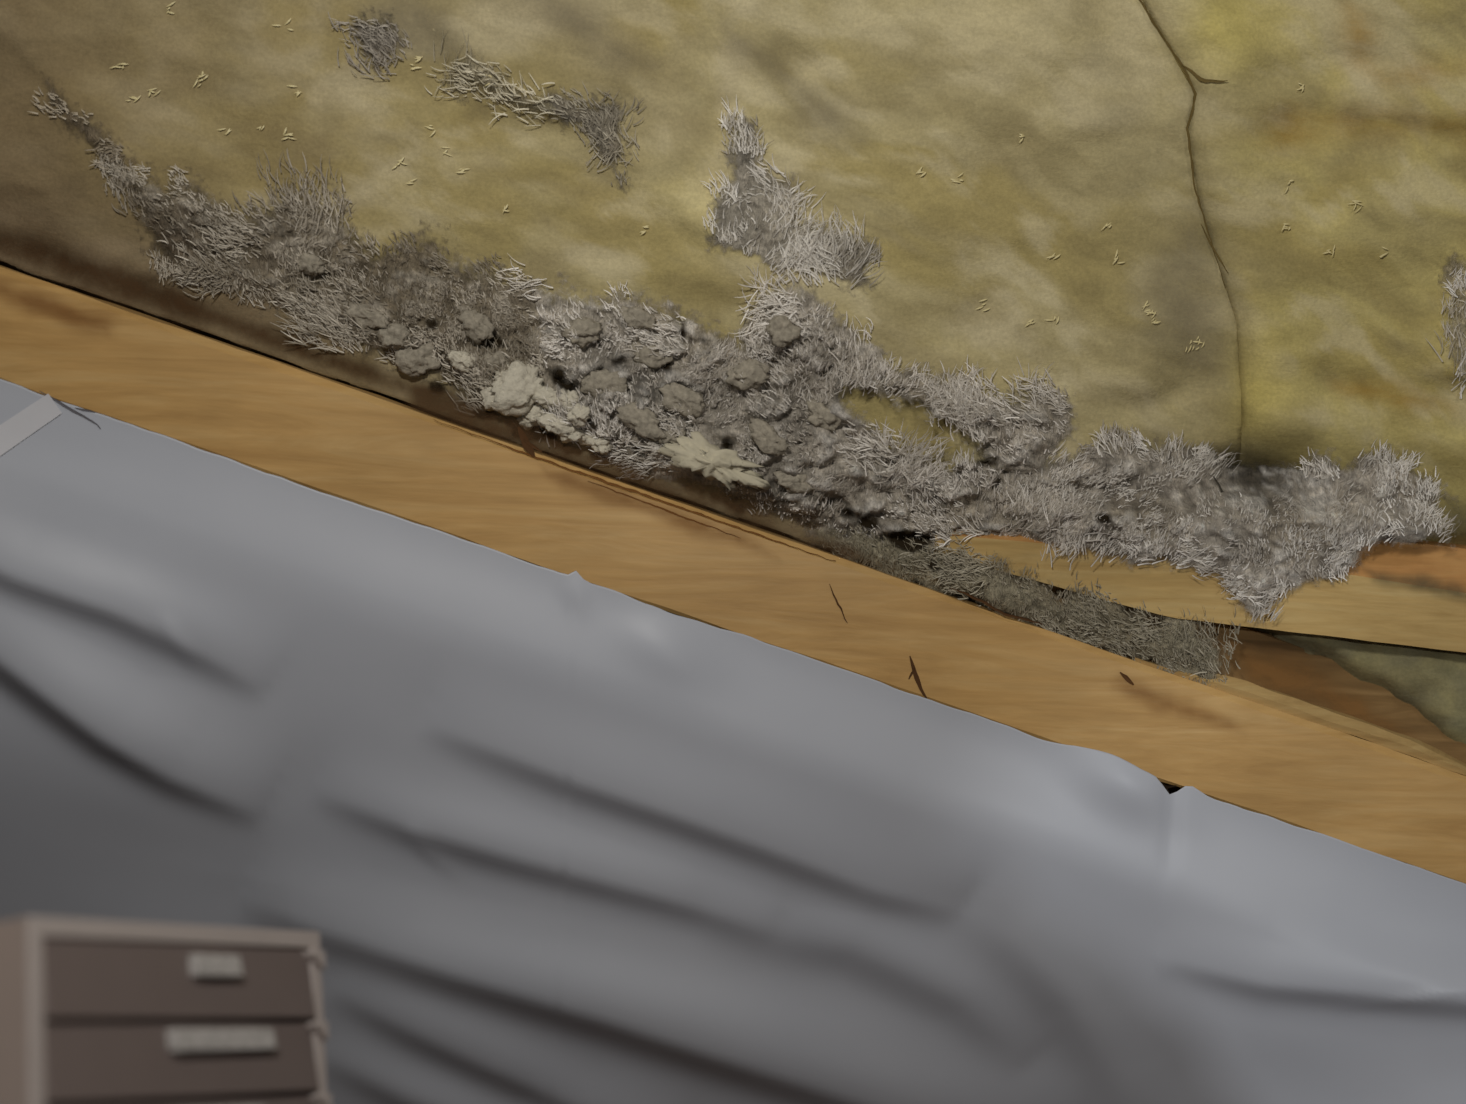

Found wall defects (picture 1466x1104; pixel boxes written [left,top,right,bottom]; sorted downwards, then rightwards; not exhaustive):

crack [1139,0,1228,288]